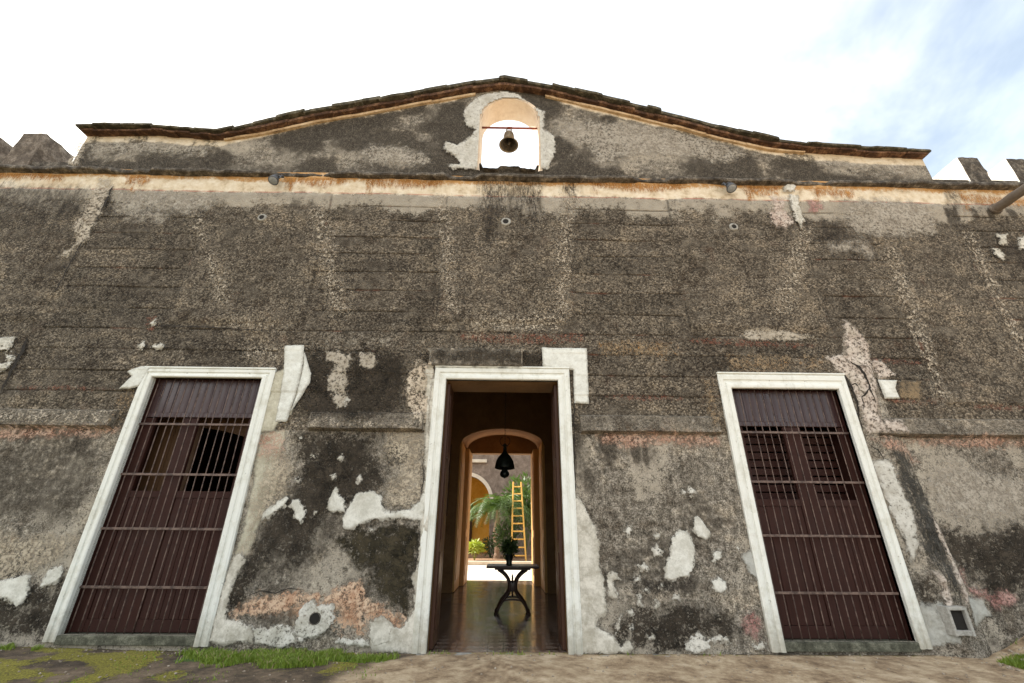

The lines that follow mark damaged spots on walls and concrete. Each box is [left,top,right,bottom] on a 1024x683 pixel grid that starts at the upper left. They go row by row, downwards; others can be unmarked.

peeling [443,142,460,157]
rust [366,179,442,193]
rust [597,183,681,192]
rust [745,186,778,201]
flaking render [770,184,812,314]
flaking render [326,350,376,407]
crack [844,361,889,471]
leakage [227,351,410,611]
leakage [892,445,1024,614]
flaking render [0,532,77,589]
leakage [336,522,420,616]
flaking render [230,578,407,636]